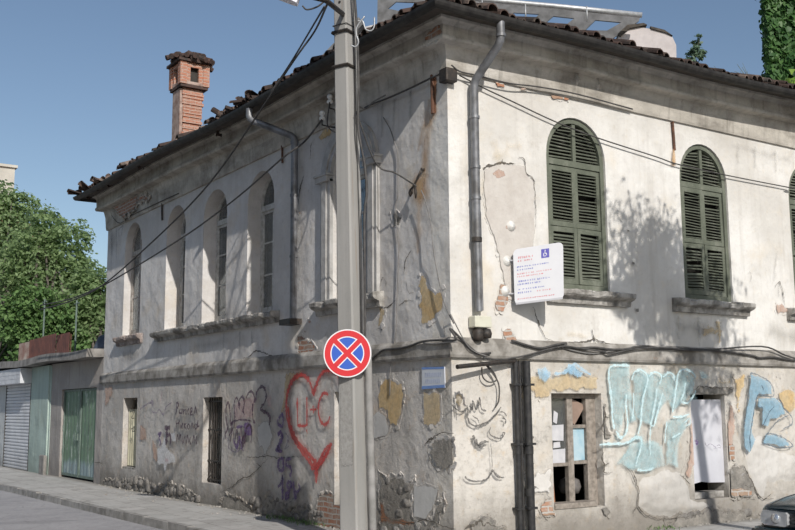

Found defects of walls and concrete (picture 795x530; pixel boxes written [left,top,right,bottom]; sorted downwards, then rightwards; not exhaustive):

flaking render [481,161,536,315]
peeling [417,272,446,326]
flaking render [296,318,318,353]
peeling [377,377,406,430]
flaking render [421,388,457,476]
peeling [521,370,613,449]
peeling [776,375,795,414]
crack [222,455,304,492]
flaking render [314,490,340,529]
flaking render [730,487,752,499]